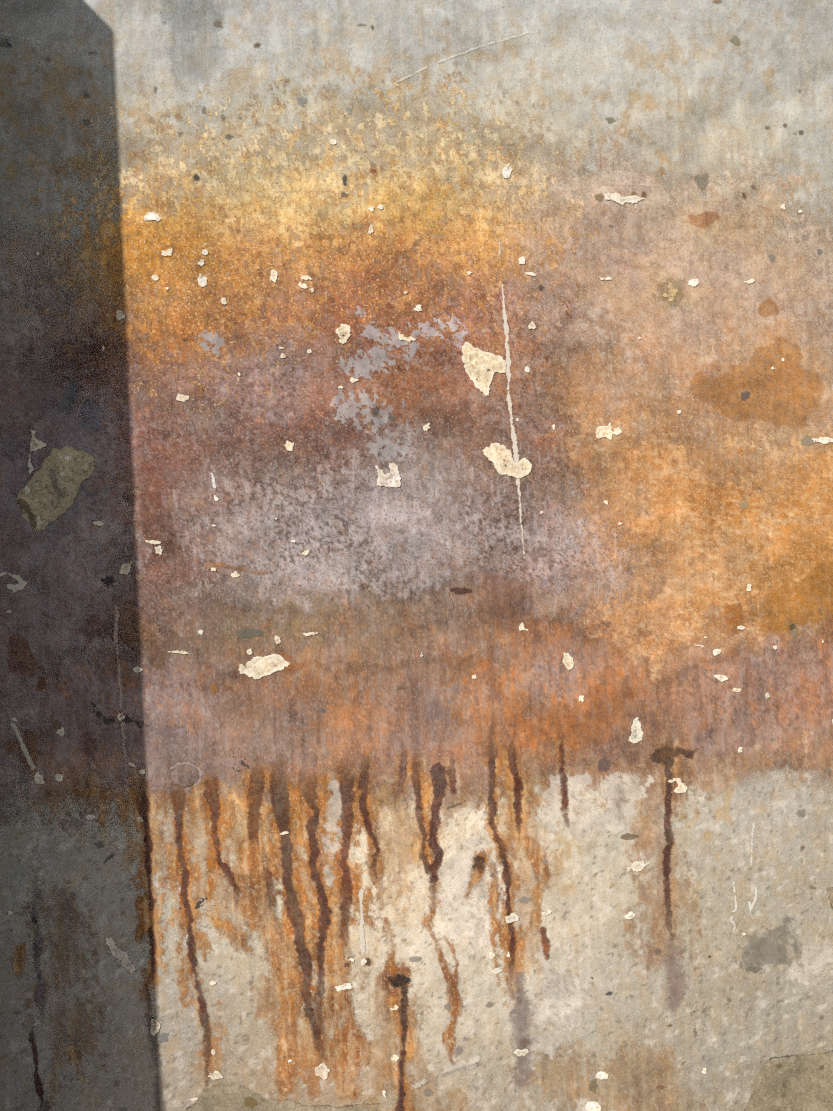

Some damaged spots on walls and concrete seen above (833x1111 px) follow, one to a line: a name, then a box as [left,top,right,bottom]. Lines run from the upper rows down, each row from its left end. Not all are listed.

spalling [335,324,351,344]
spalling [462,342,506,396]
crack [502,284,525,558]
spalling [16,430,95,531]
spalling [375,463,401,488]
spalling [482,443,532,479]
spalling [238,635,303,680]
rust [466,849,492,896]
rust [234,838,302,1094]
rust [422,909,462,1062]
rust [539,927,550,960]
rust [377,918,416,1111]